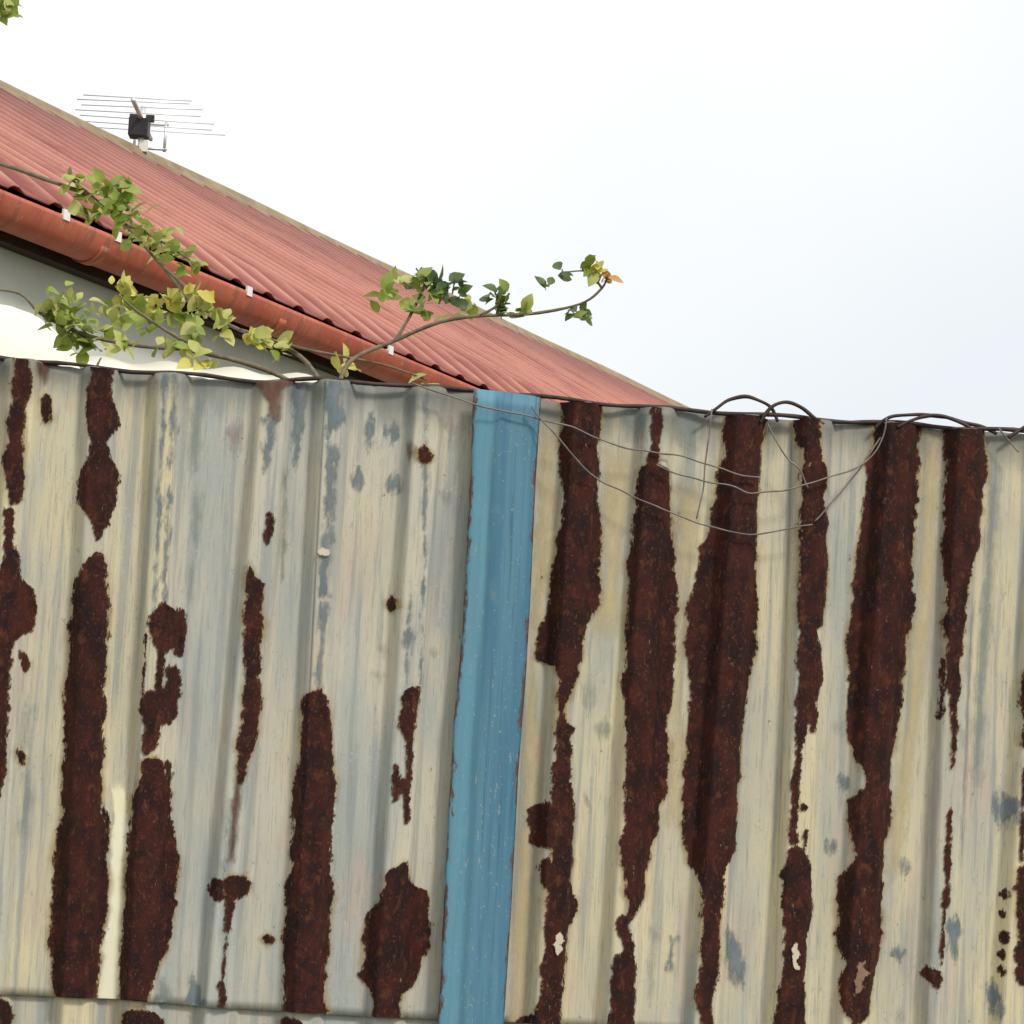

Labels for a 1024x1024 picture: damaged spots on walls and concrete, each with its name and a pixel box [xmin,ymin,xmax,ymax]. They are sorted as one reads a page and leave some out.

corrosion [0,358,53,797]
corrosion [47,367,122,999]
corrosion [118,601,188,1024]
corrosion [231,565,265,857]
corrosion [261,688,339,1024]
corrosion [357,861,432,1018]
corrosion [391,686,421,825]
corrosion [515,401,603,1024]
corrosion [607,407,768,1024]
corrosion [773,418,830,1024]
corrosion [833,422,923,1024]
corrosion [934,428,988,771]